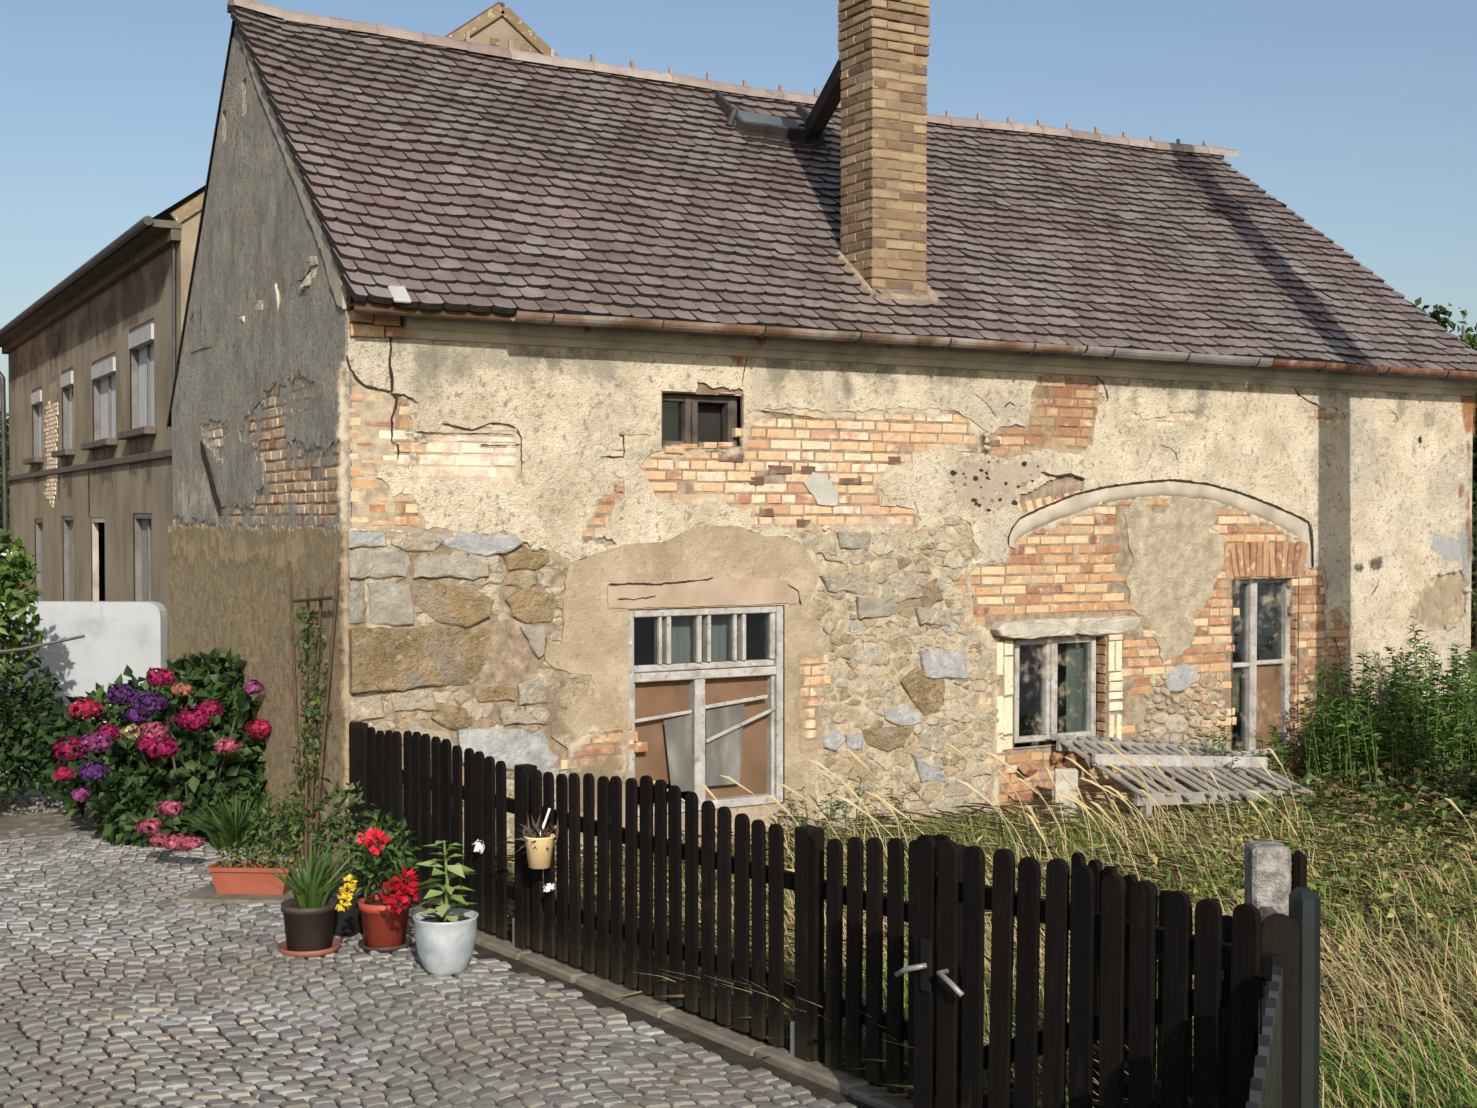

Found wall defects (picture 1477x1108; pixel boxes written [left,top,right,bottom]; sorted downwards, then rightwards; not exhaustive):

spalling [44,340,61,508]
crack [200,440,221,522]
spalling [173,230,648,869]
crack [346,337,522,474]
spalling [581,374,1353,833]